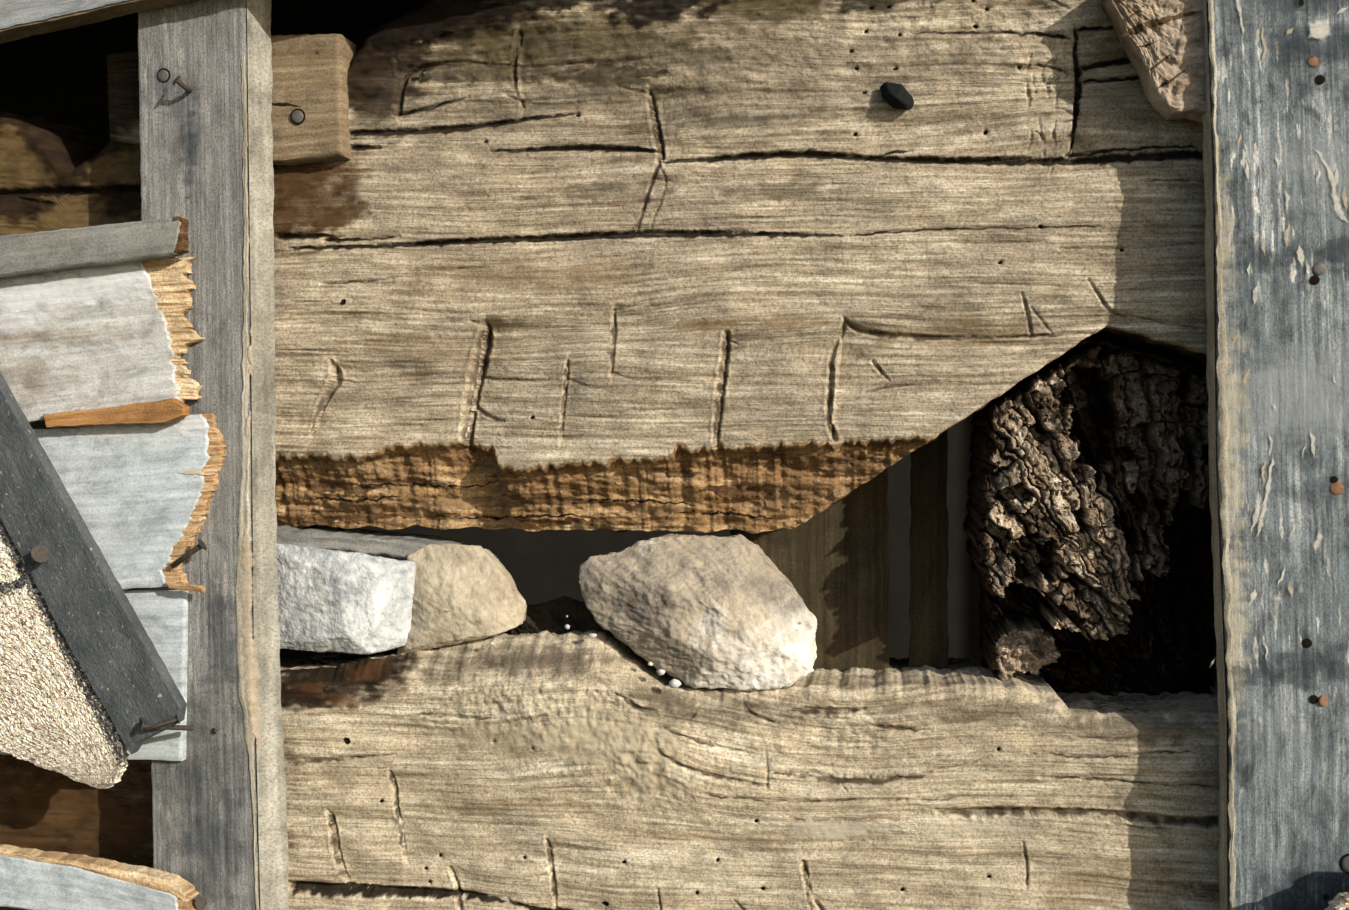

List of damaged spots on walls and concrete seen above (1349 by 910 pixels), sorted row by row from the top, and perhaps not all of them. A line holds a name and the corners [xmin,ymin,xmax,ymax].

crack [272,101,300,109]
water stain [347,0,831,126]
crack [281,0,1204,302]
peeling [0,262,151,329]
peeling [164,415,208,437]
crack [462,330,491,441]
crack [609,318,617,363]
crack [713,339,729,436]
crack [826,363,835,433]
crack [846,321,1081,391]
crack [309,754,404,845]
crack [293,814,567,910]